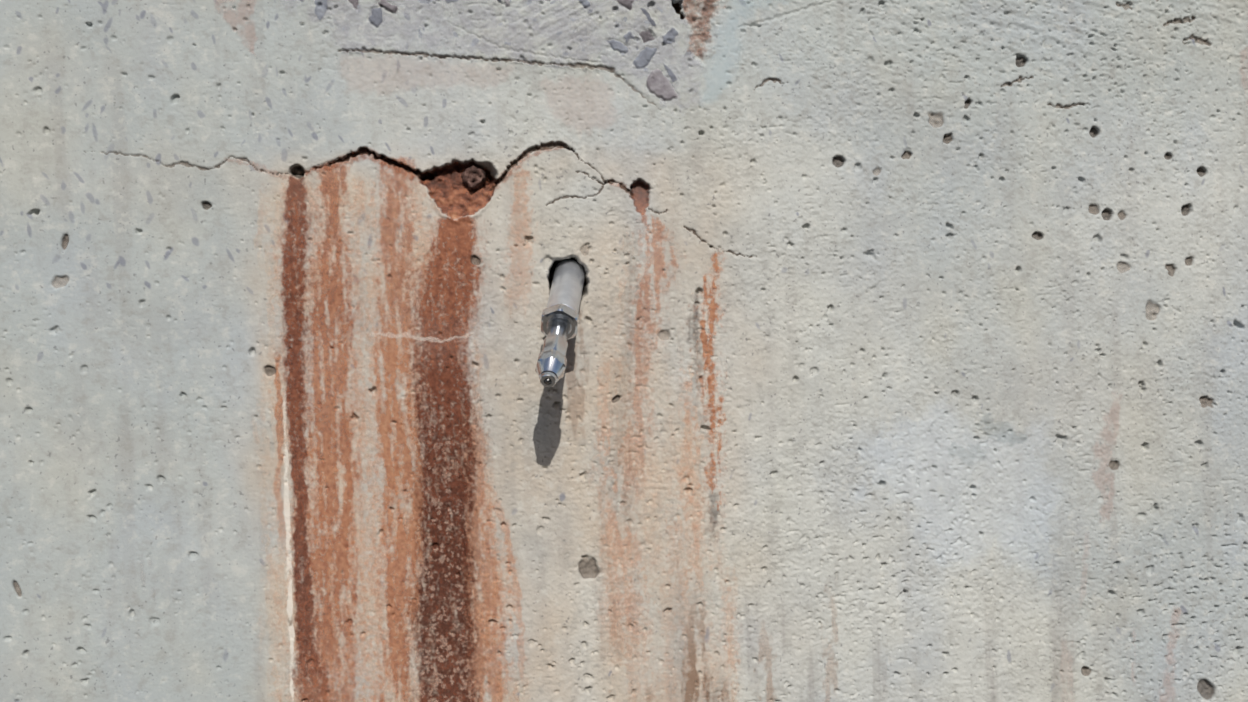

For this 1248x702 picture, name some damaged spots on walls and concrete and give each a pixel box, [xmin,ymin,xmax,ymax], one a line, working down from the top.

spalling [315,0,332,20]
spalling [349,0,398,27]
spalling [580,0,718,100]
crack [305,148,435,181]
spalling [421,162,497,220]
crack [490,142,752,258]
spalling [630,180,649,215]
corrosion [700,254,726,490]
corrosion [275,164,505,702]